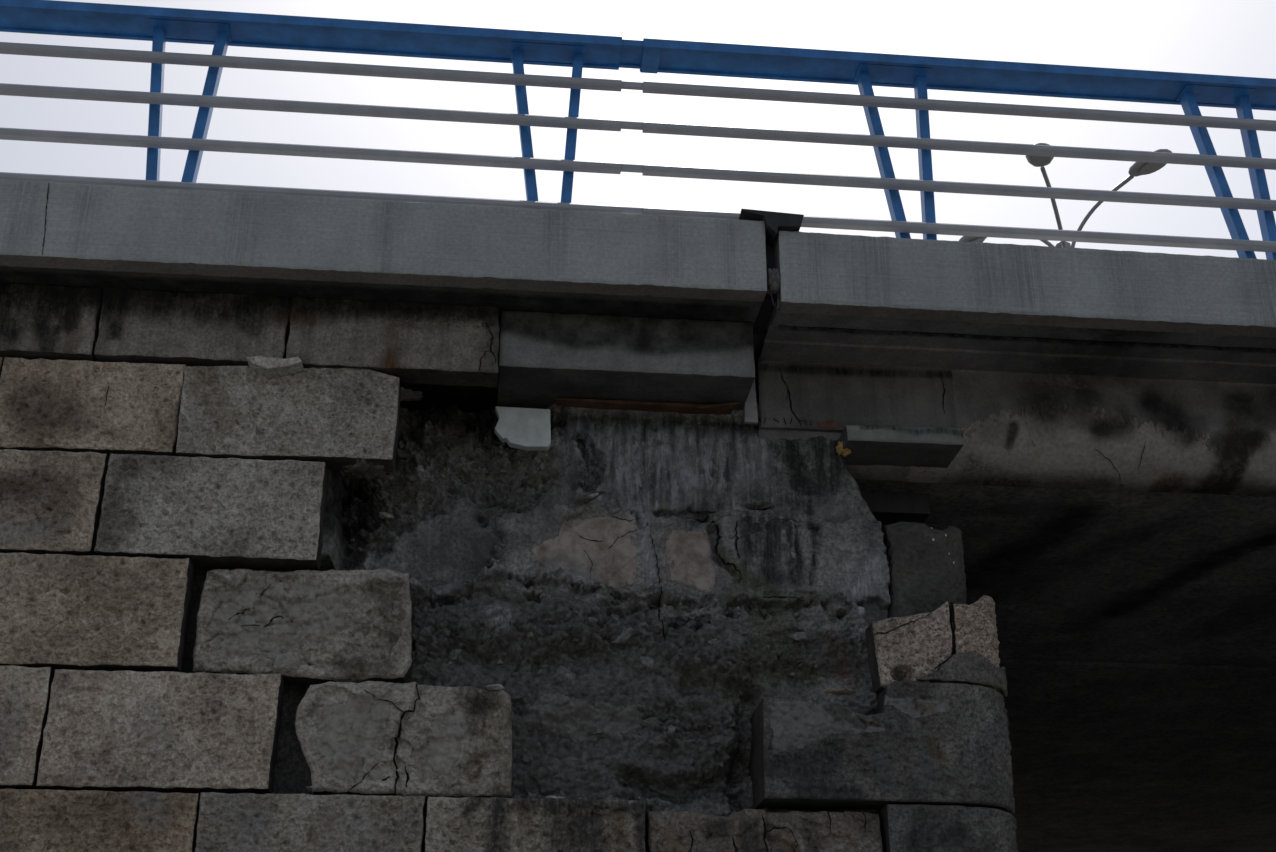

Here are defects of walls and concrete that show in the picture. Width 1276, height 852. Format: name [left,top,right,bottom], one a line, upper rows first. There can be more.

leakage [0,271,754,353]
crack [478,322,496,372]
leakage [882,331,1276,353]
crack [758,368,812,426]
leakage [1091,417,1130,437]
leakage [1141,393,1195,443]
leakage [1164,391,1276,497]
leakage [548,413,848,591]
crack [884,527,893,595]
spalling [408,433,864,806]
crack [874,602,955,670]
crack [347,684,420,794]